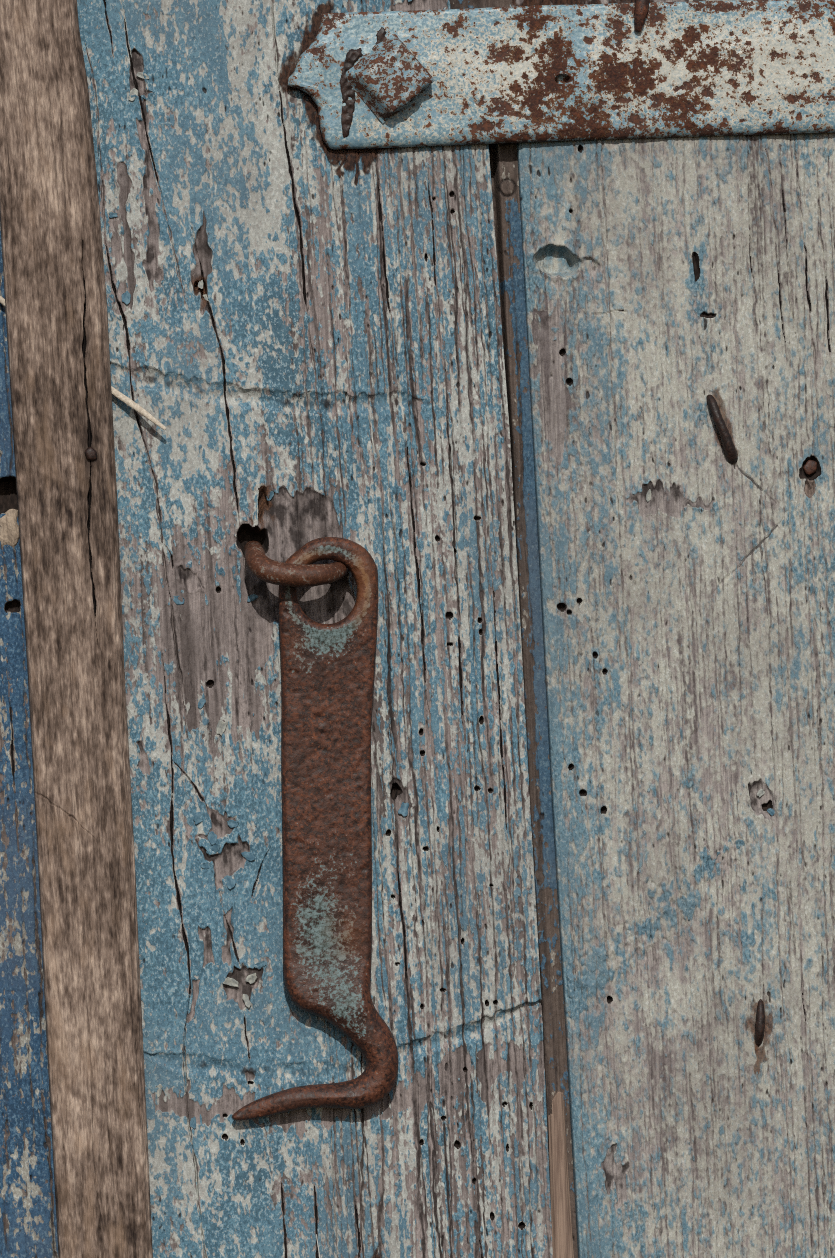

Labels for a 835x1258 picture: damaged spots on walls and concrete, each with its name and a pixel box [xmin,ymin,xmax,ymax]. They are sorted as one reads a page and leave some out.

crack [103,0,158,182]
corrosion [278,1,395,185]
peeling [392,0,447,11]
corrosion [501,0,656,140]
corrosion [660,23,733,132]
crack [279,91,306,304]
crack [199,261,239,517]
peeling [153,535,274,744]
crack [164,676,204,998]
peeling [193,804,255,891]
peeling [187,908,266,1023]